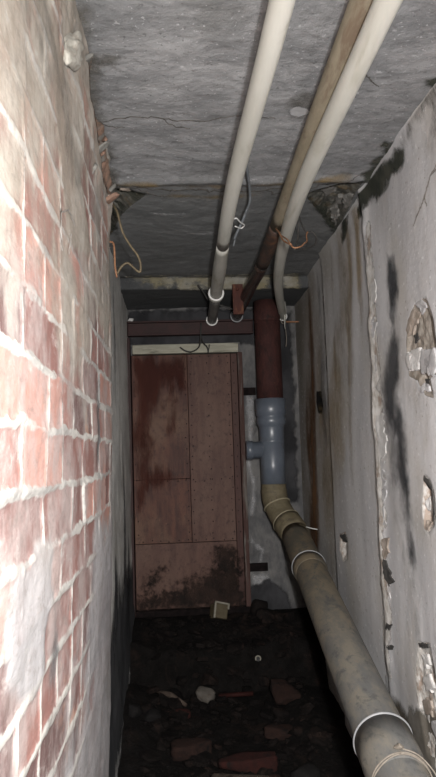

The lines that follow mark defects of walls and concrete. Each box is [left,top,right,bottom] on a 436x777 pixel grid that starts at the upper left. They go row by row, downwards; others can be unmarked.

spalling [85,53,145,235]
damp [308,142,404,345]
spalling [406,299,436,398]
spalling [421,475,436,533]
damp [113,524,130,658]
damp [393,701,436,777]
spalling [416,640,436,767]